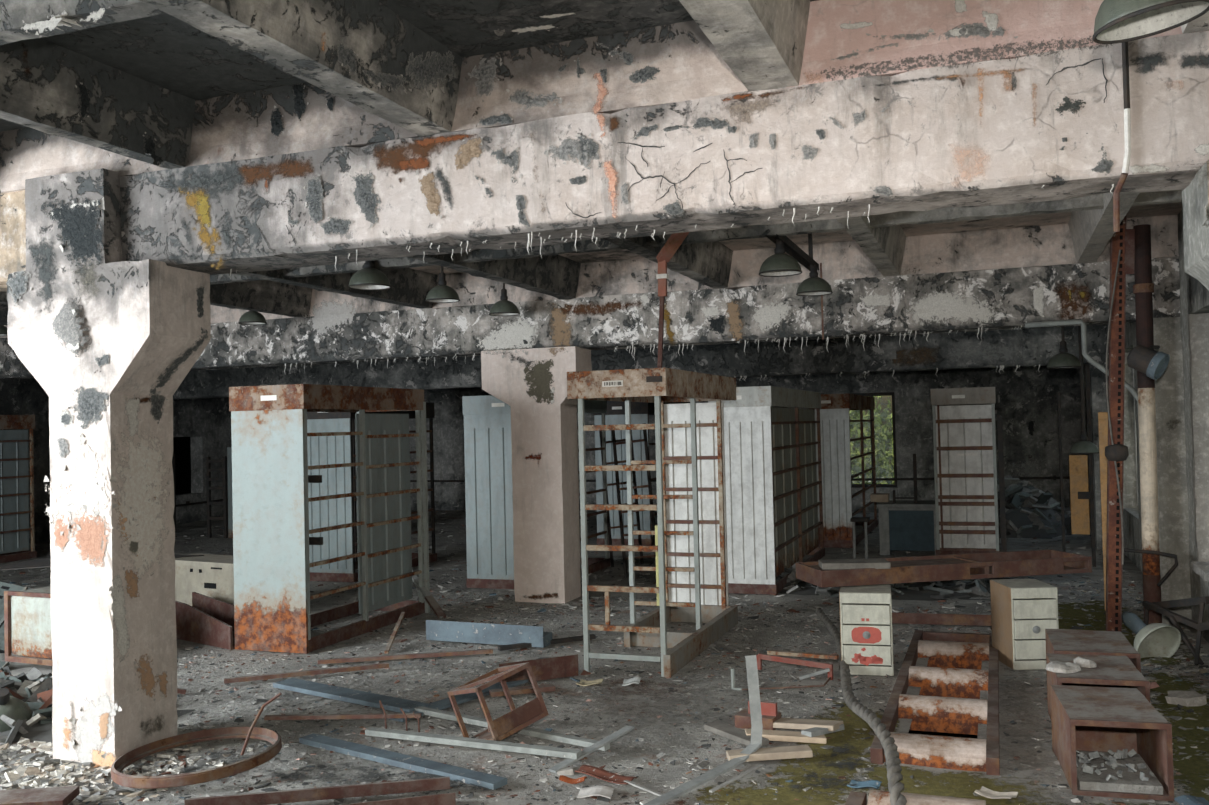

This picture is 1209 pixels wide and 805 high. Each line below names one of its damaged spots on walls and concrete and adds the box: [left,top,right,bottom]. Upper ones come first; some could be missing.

corrosion [592,73,619,136]
spalling [558,42,660,87]
crack [1046,58,1108,103]
corrosion [239,159,314,192]
corrosion [373,134,476,183]
corrosion [603,161,617,218]
crack [565,142,762,218]
spalling [40,197,125,266]
leakage [664,301,675,344]
leakage [511,301,643,404]
flaking render [44,286,213,701]